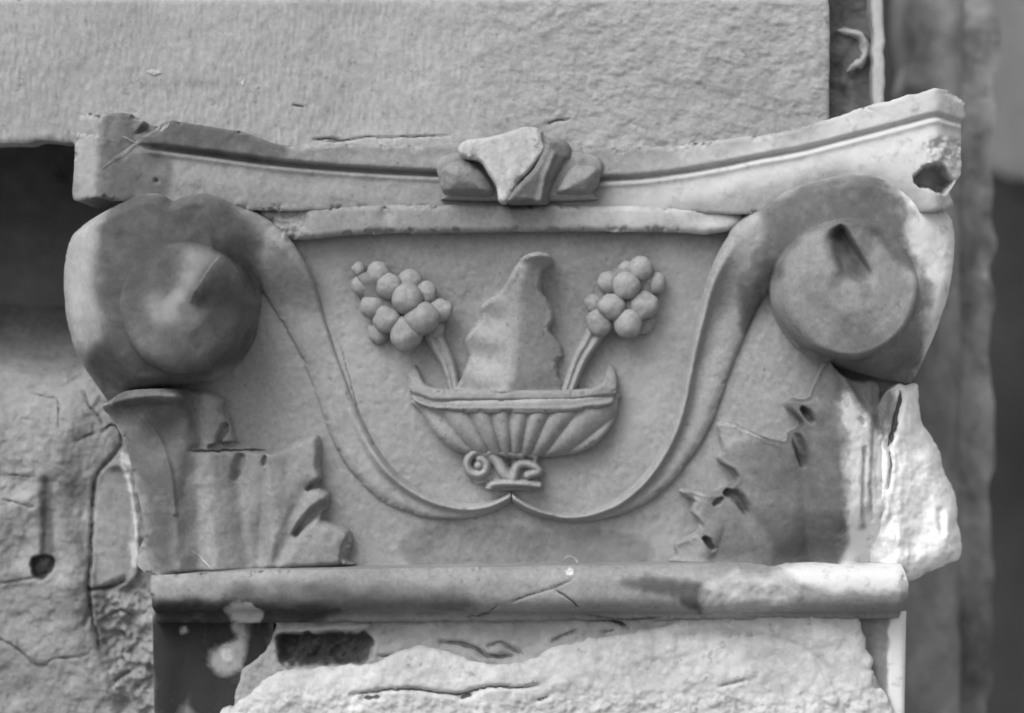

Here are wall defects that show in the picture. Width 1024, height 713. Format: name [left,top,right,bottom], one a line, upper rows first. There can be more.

crack [887,390,902,486]
crack [4,372,130,686]
water stain [703,392,908,638]
spalling [275,631,373,666]
crack [469,580,655,641]